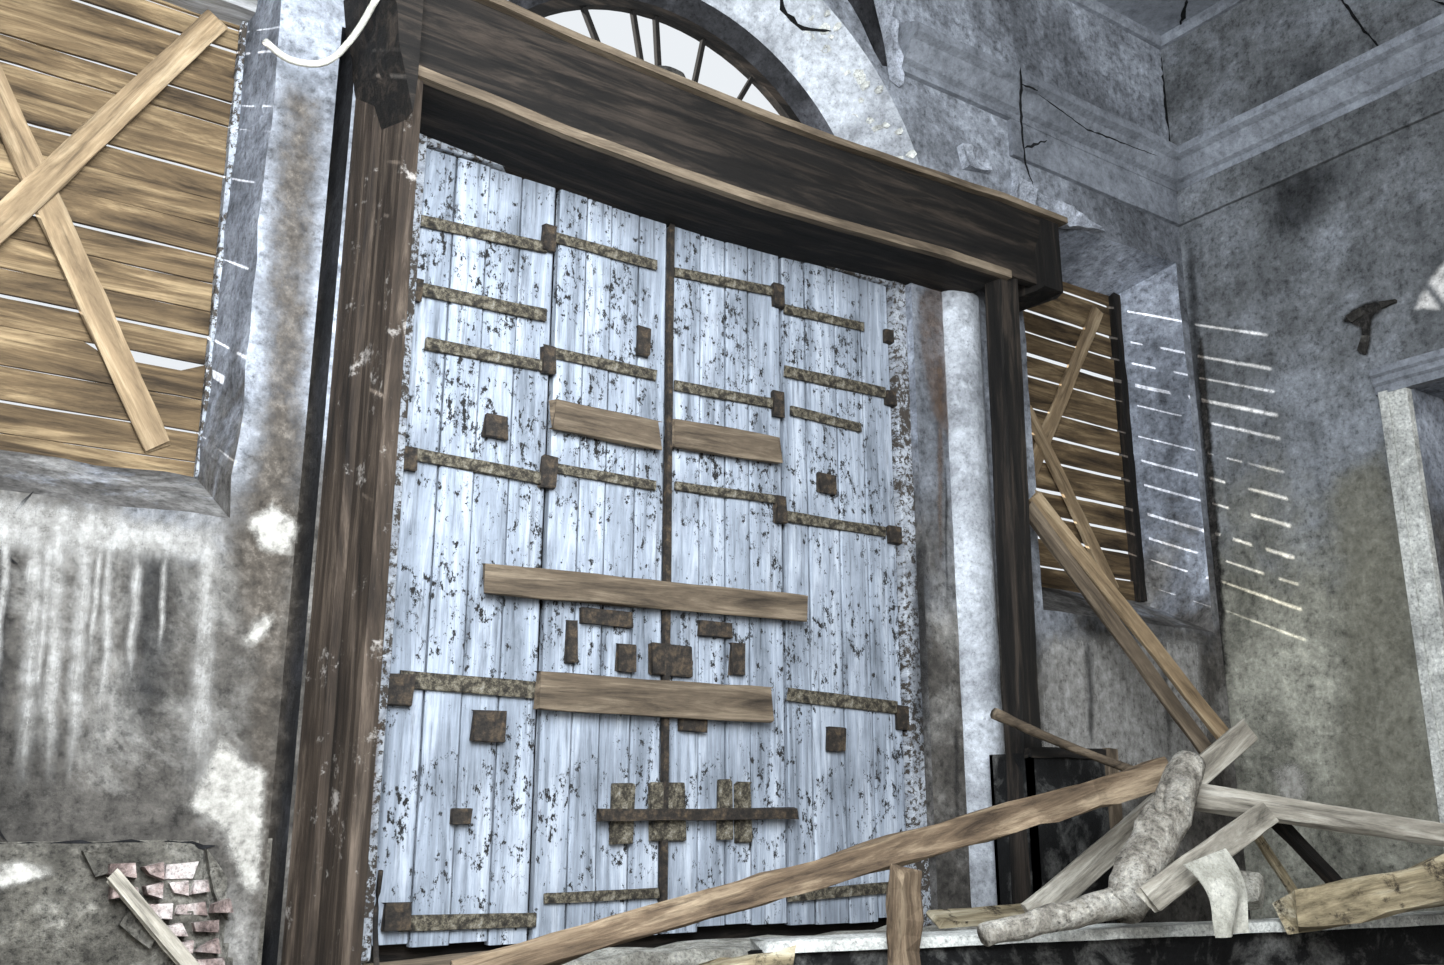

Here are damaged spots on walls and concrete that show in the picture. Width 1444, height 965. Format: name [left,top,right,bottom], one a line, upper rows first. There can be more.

crack [780,0,831,32]
crack [1180,0,1188,25]
crack [1341,0,1379,46]
leakage [0,96,313,890]
crack [0,830,215,850]
spalling [81,846,234,965]